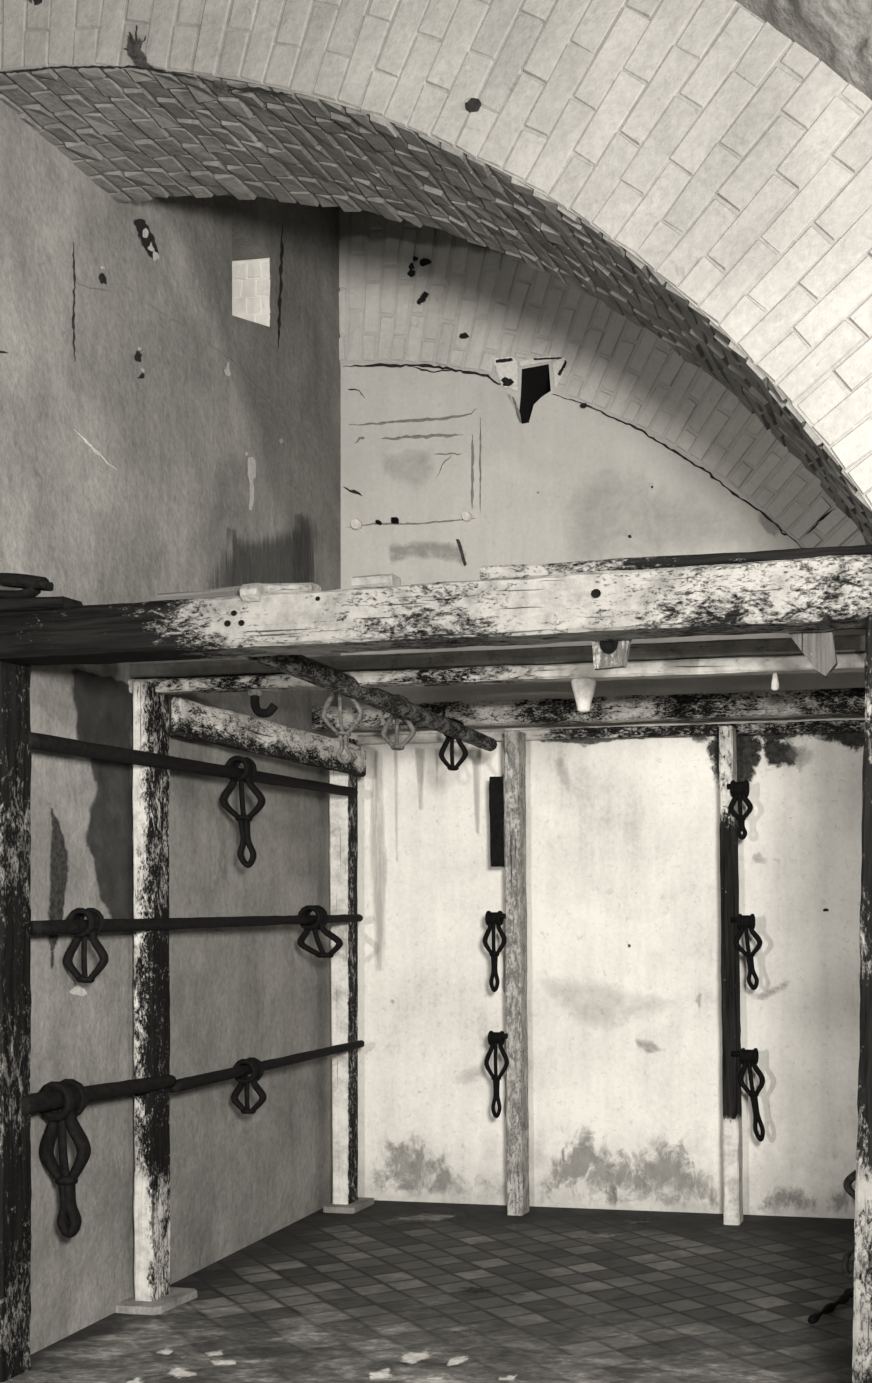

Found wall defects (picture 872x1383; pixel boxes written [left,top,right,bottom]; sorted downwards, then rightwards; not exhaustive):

water stain [381,1144,452,1191]
water stain [548,1133,714,1203]
water stain [766,1190,815,1207]